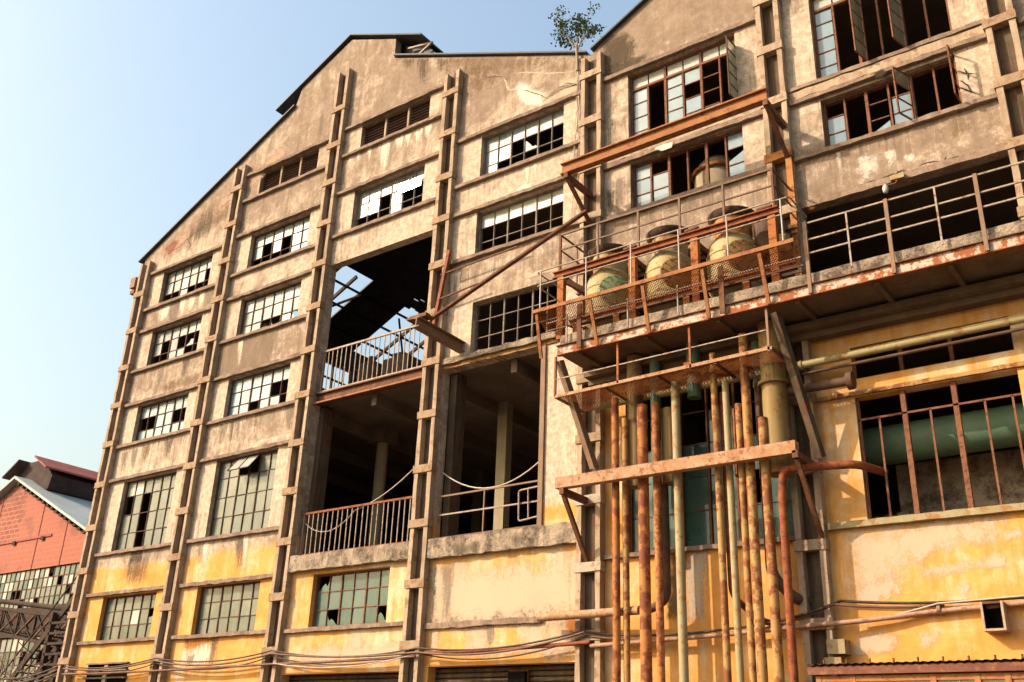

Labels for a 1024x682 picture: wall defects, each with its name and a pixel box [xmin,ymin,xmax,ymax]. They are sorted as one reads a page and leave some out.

crack [487,71,574,98]
leakage [127,551,151,582]
leakage [236,535,249,568]
peeling [849,514,1023,605]